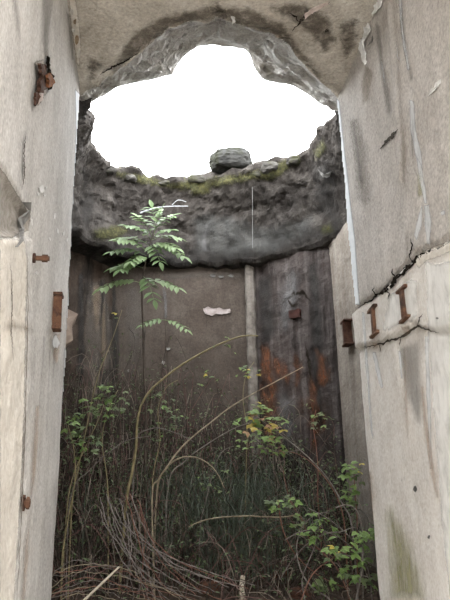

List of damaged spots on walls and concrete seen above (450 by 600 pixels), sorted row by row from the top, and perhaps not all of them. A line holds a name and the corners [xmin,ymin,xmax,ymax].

damp [118,7,318,75]
damp [279,5,334,48]
crack [290,2,330,31]
damp [341,22,355,55]
peeling [358,23,373,65]
crack [100,53,138,75]
crack [360,239,449,307]
peeling [203,307,231,316]
crack [364,315,437,351]